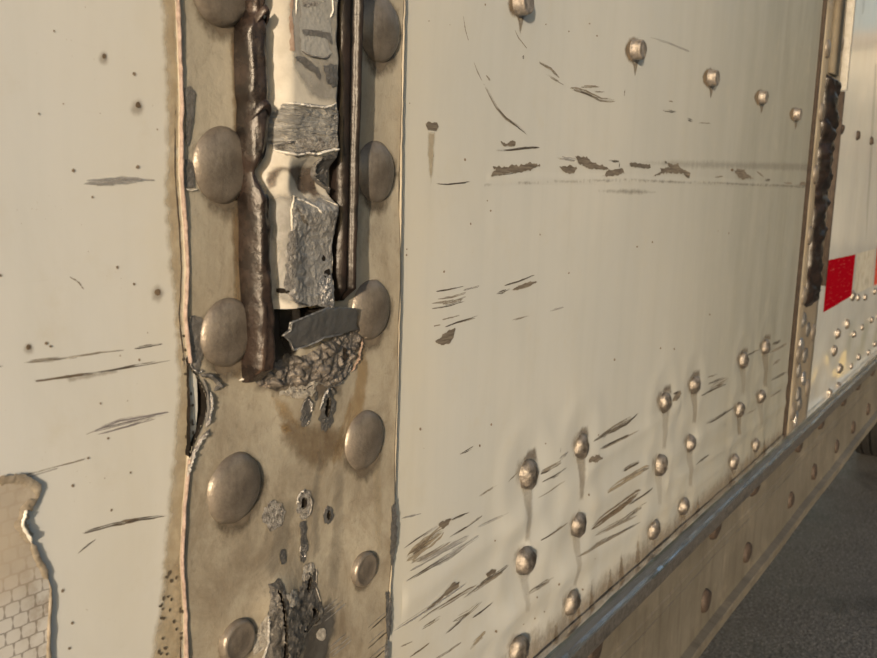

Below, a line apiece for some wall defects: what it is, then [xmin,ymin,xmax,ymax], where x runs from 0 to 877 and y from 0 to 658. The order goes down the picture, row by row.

peeling [289,0,338,87]
corrosion [625,38,639,71]
peeling [267,102,340,158]
peeling [501,140,539,151]
peeling [491,162,540,177]
peeling [559,156,690,179]
peeling [715,168,770,181]
peeling [276,195,339,307]